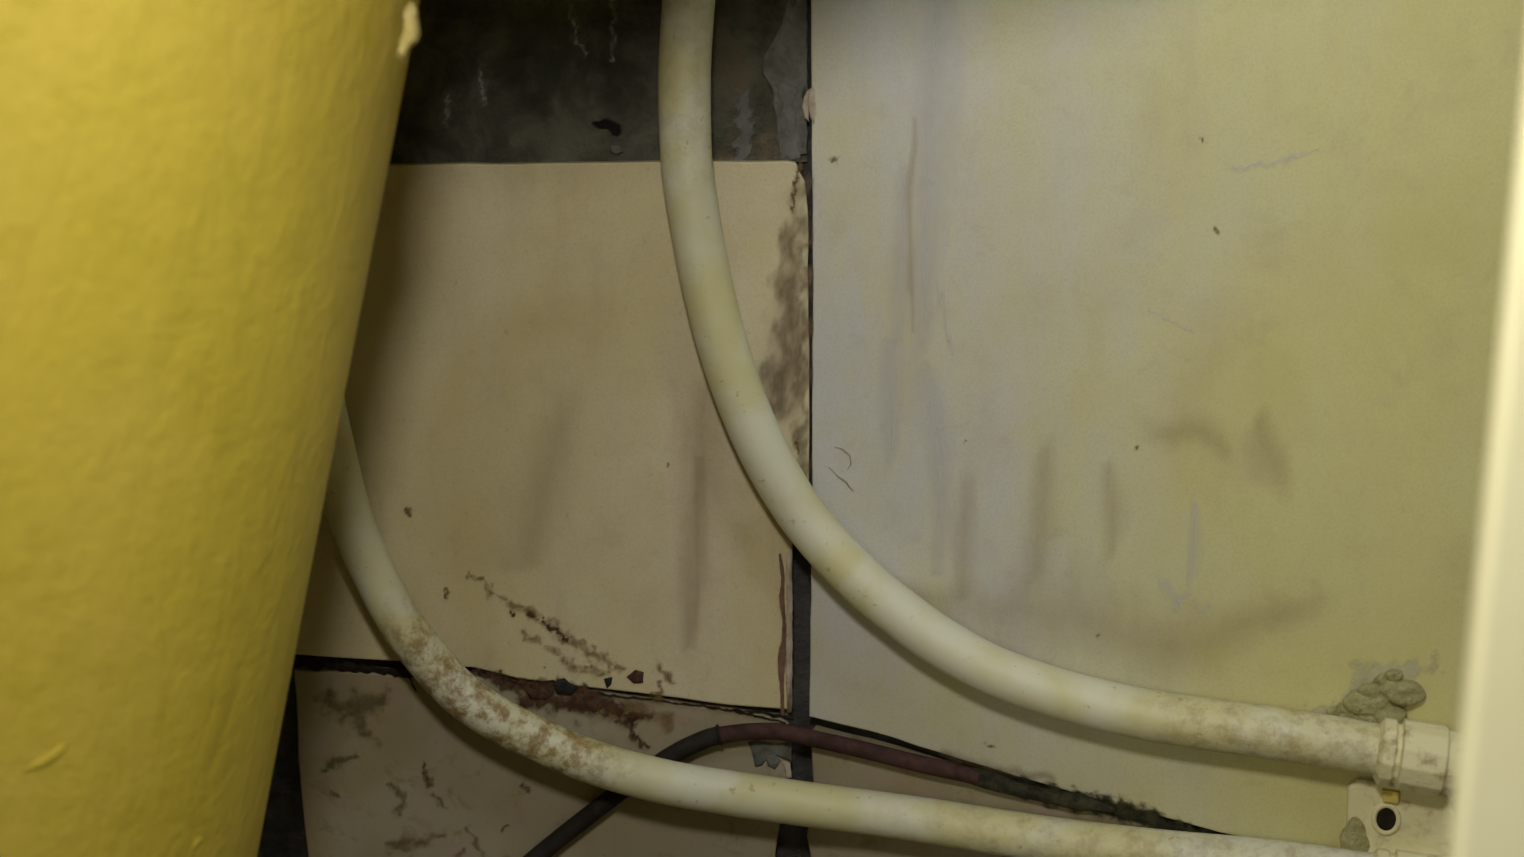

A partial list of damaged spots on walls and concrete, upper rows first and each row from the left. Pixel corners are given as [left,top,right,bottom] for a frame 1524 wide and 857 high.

rust [471,602,672,748]